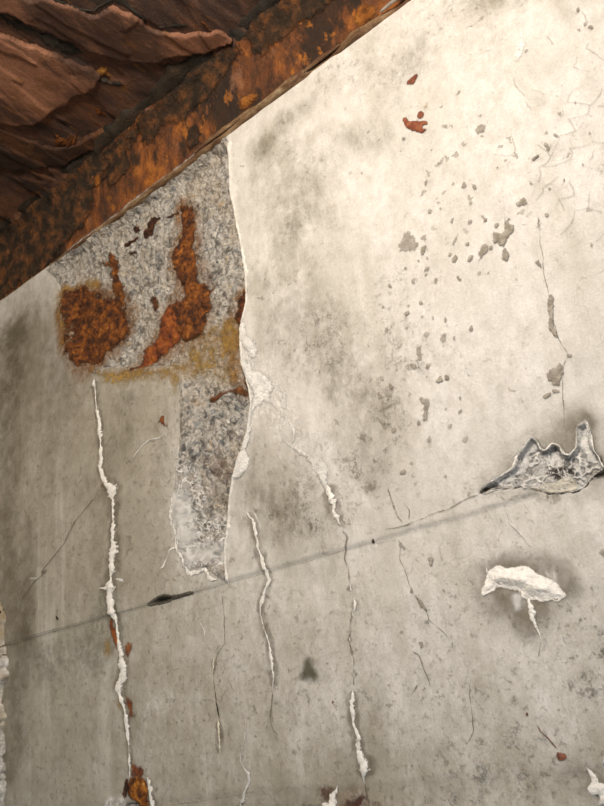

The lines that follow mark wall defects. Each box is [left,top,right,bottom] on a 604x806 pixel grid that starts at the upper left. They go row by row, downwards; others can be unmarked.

rust [195,94,256,153]
rust [303,44,340,73]
rust [403,111,427,133]
spalling [47,137,250,580]
rust [56,202,249,403]
crack [0,377,155,806]
rust [122,765,149,806]
crack [200,600,251,806]
crack [243,501,277,734]
crack [262,383,371,797]
crack [372,490,476,691]
crack [586,757,604,805]